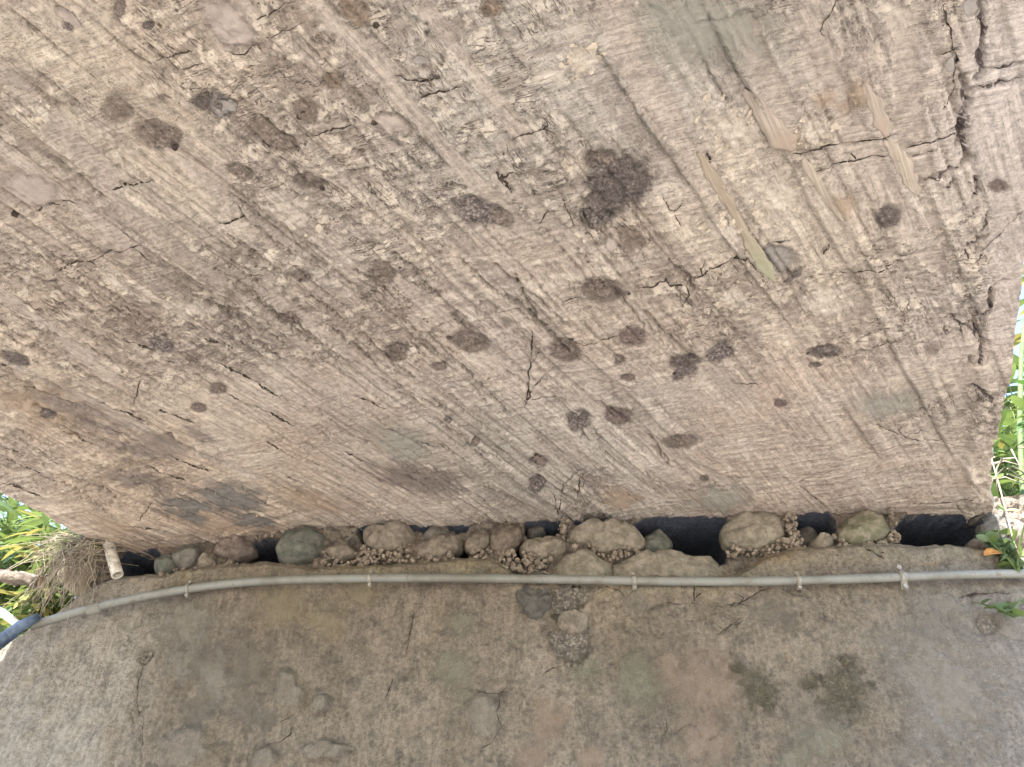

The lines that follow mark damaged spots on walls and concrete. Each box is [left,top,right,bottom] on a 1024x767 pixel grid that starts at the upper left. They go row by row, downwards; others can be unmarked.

crack [939,4,959,109]
crack [792,126,967,172]
peeling [693,93,823,282]
crack [59,232,163,271]
crack [640,255,758,303]
crack [524,333,559,408]
crack [130,647,149,762]